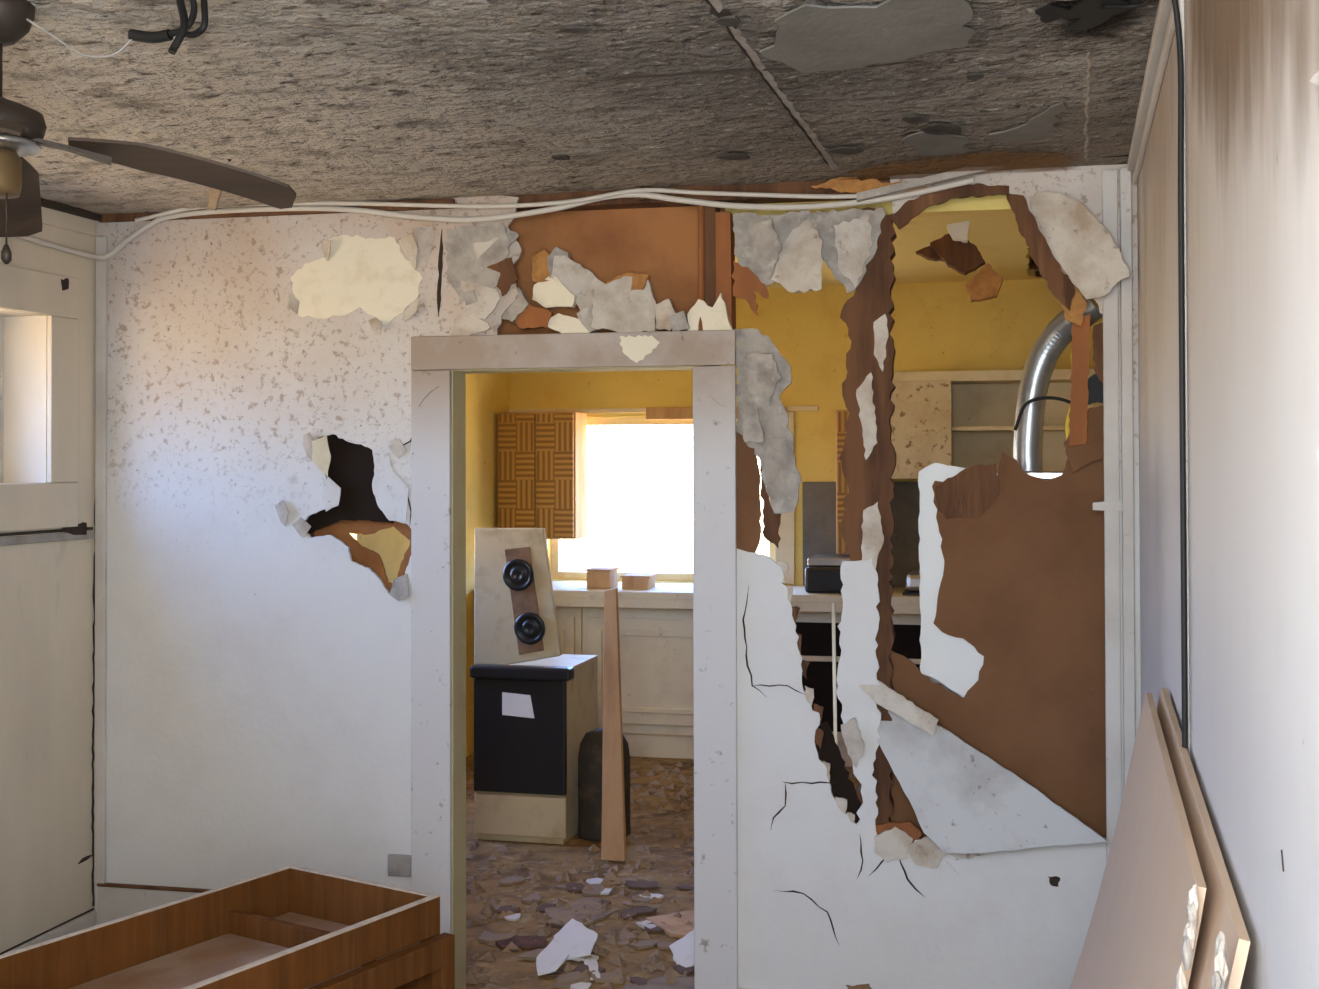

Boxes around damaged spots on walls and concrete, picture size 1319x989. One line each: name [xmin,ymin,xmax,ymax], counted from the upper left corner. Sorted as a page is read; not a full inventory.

peeling [760,0,976,73]
peeling [288,223,520,336]
peeling [916,220,1003,303]
flaking render [275,432,411,538]
flaking render [390,574,409,601]
crack [770,781,836,830]
crack [857,838,926,898]
peeling [874,821,985,868]
crack [774,890,840,946]